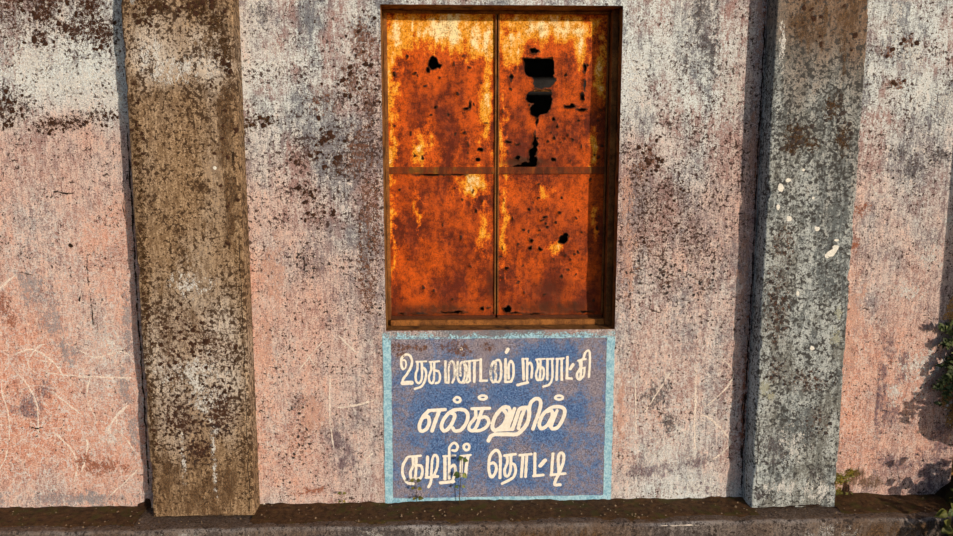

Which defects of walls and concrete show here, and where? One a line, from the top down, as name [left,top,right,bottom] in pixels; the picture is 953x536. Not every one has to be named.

leakage [779,0,866,159]
leakage [0,0,279,515]
leakage [763,221,837,464]
leakage [763,477,830,502]